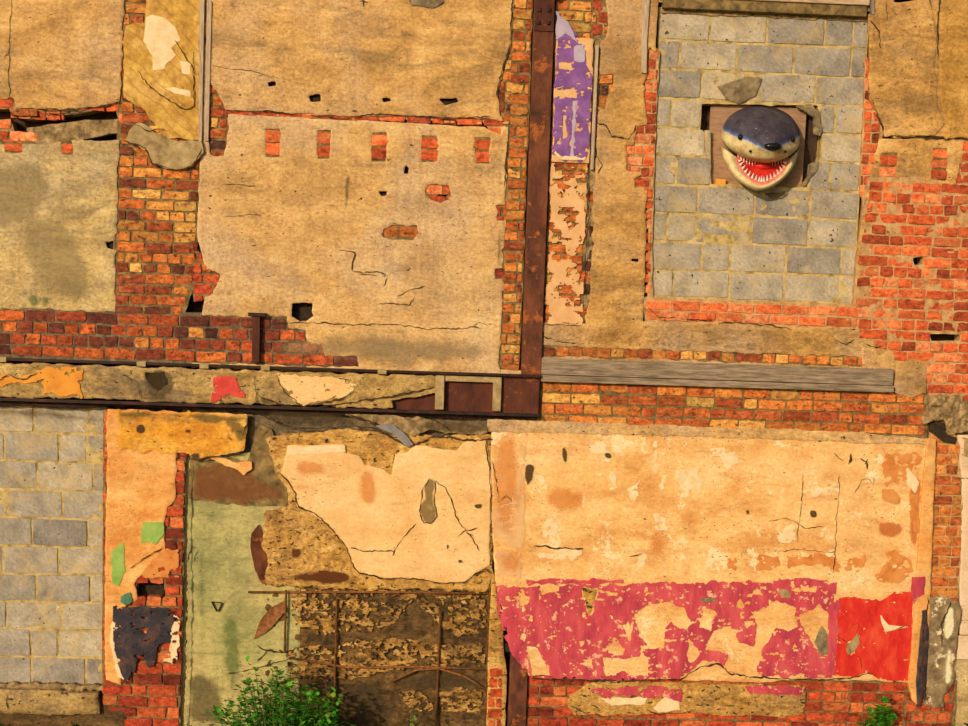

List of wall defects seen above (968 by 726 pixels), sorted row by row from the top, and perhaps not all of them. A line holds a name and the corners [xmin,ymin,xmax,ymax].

spalling [0,98,123,153]
crack [40,101,122,115]
crack [124,123,202,171]
crack [138,42,277,110]
crack [224,0,513,119]
peeling [545,0,613,325]
spalling [851,58,968,401]
crack [271,250,486,330]
peeling [0,367,83,399]
peeling [110,543,180,681]
crack [131,376,512,726]
peeling [254,440,962,713]